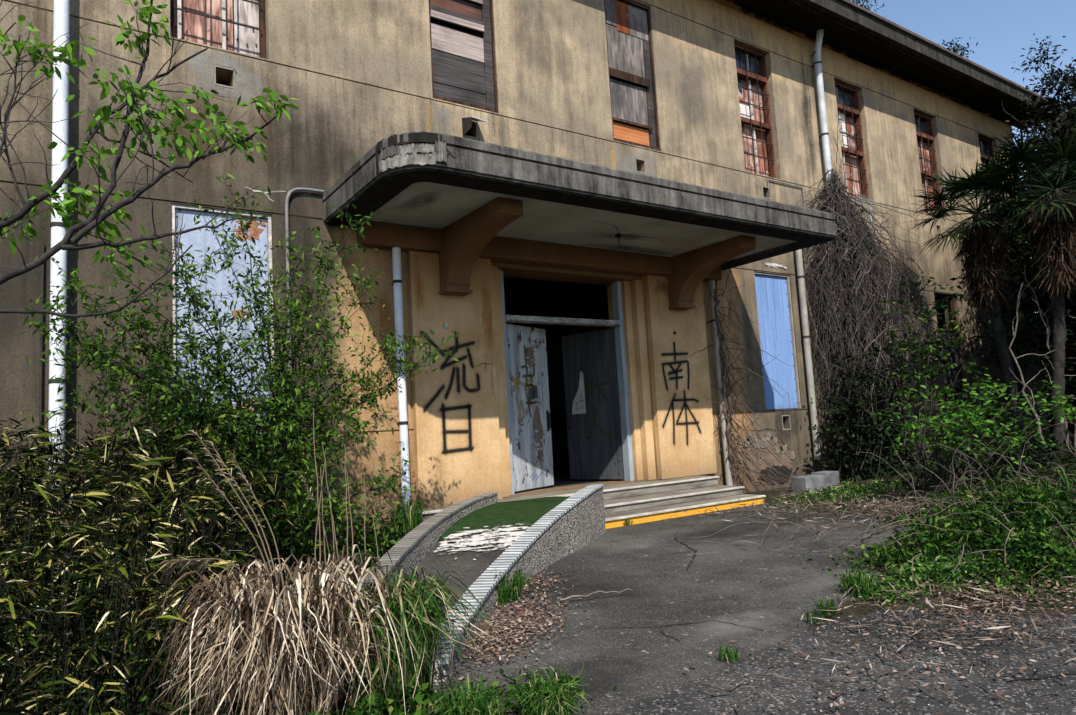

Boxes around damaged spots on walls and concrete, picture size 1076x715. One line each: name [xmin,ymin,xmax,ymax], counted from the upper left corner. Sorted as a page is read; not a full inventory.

spalling [375,132,447,175]
peeling [525,347,536,368]
peeling [531,397,547,469]